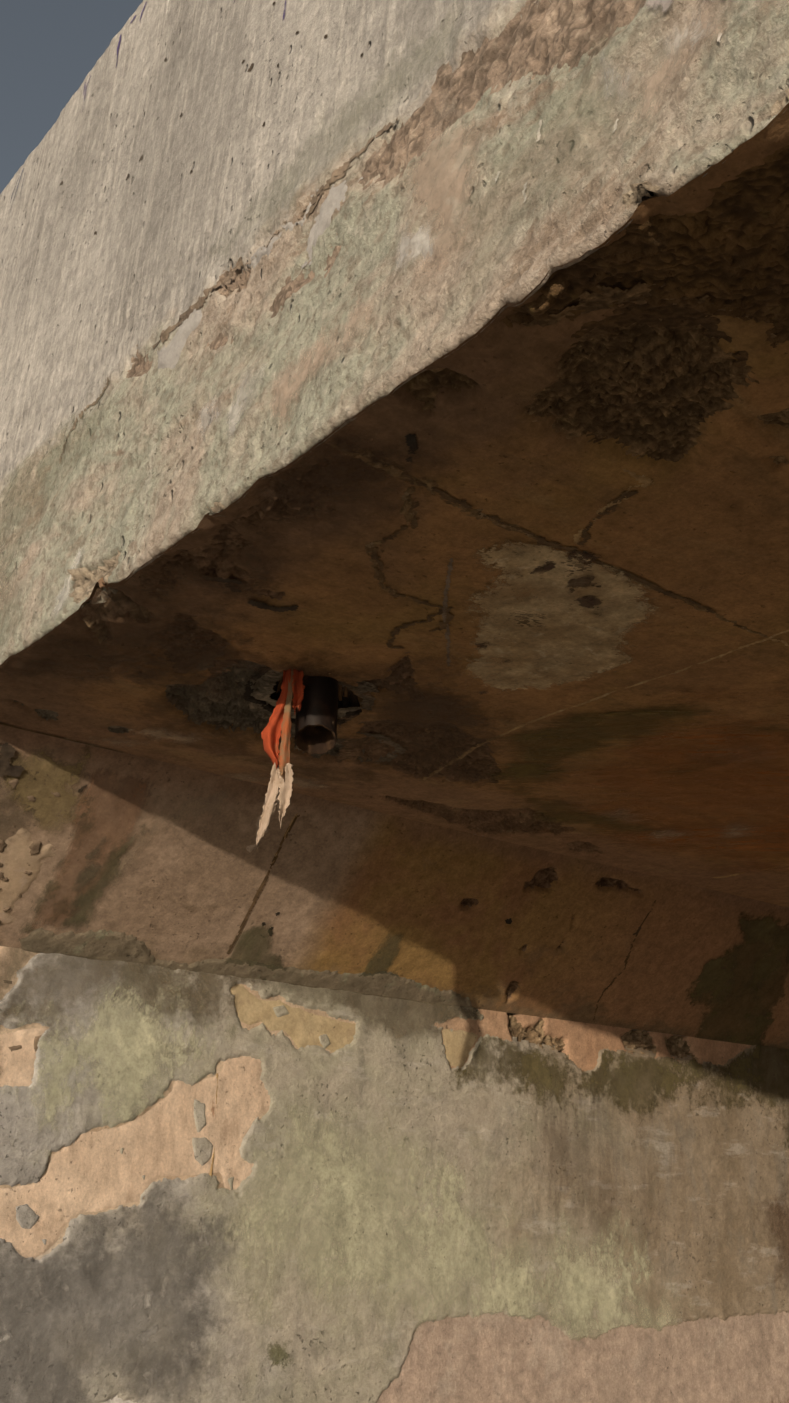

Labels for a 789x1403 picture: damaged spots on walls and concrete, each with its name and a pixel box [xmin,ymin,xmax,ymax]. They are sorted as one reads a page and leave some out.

spalling [770,88,789,118]
spalling [502,145,789,384]
crack [331,442,789,666]
damp [467,541,659,695]
spalling [165,659,406,762]
peeling [0,827,65,924]
peeling [0,946,26,990]
peeling [0,1028,48,1086]
peeling [230,984,356,1052]
peeling [0,1056,271,1258]
damp [0,1202,220,1403]